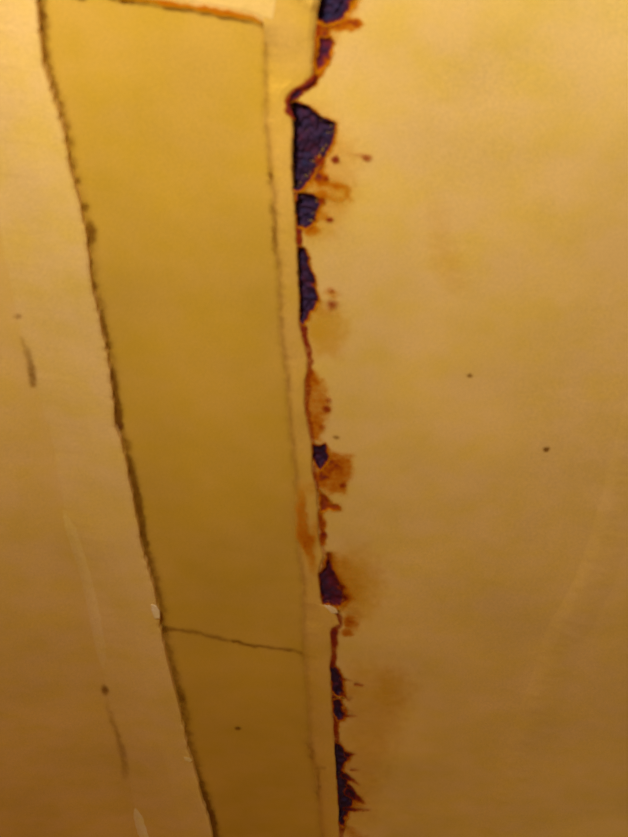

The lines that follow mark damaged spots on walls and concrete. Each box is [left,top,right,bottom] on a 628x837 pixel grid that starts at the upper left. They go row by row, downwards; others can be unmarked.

spalling [313,0,363,86]
spalling [290,101,350,326]
corrosion [307,370,331,440]
corrosion [295,491,315,565]
spalling [311,442,355,613]
spalling [330,666,364,828]